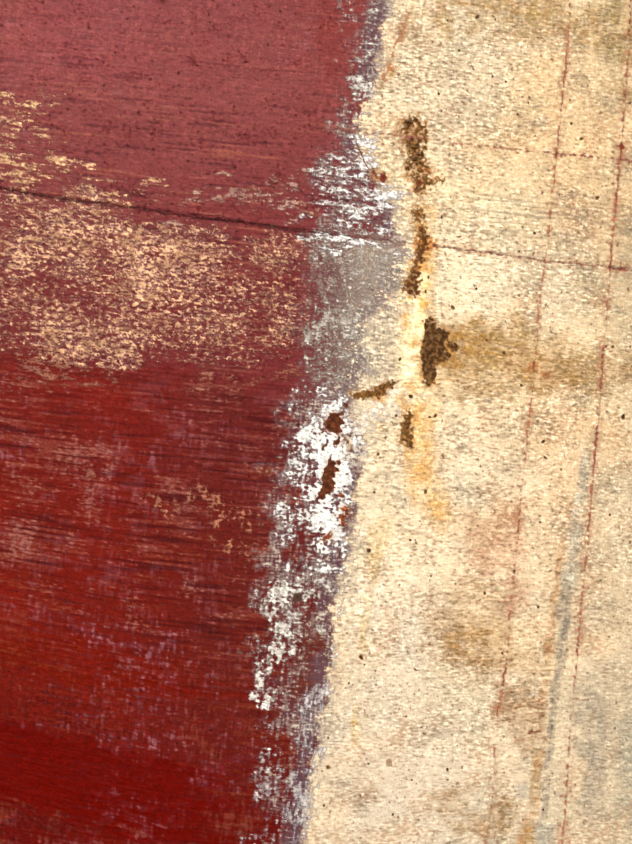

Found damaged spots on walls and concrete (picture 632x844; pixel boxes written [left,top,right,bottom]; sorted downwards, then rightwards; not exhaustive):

crack [0,187,113,206]
crack [133,207,366,238]
corrosion [397,112,445,227]
peeling [0,28,432,737]
water stain [438,320,601,390]